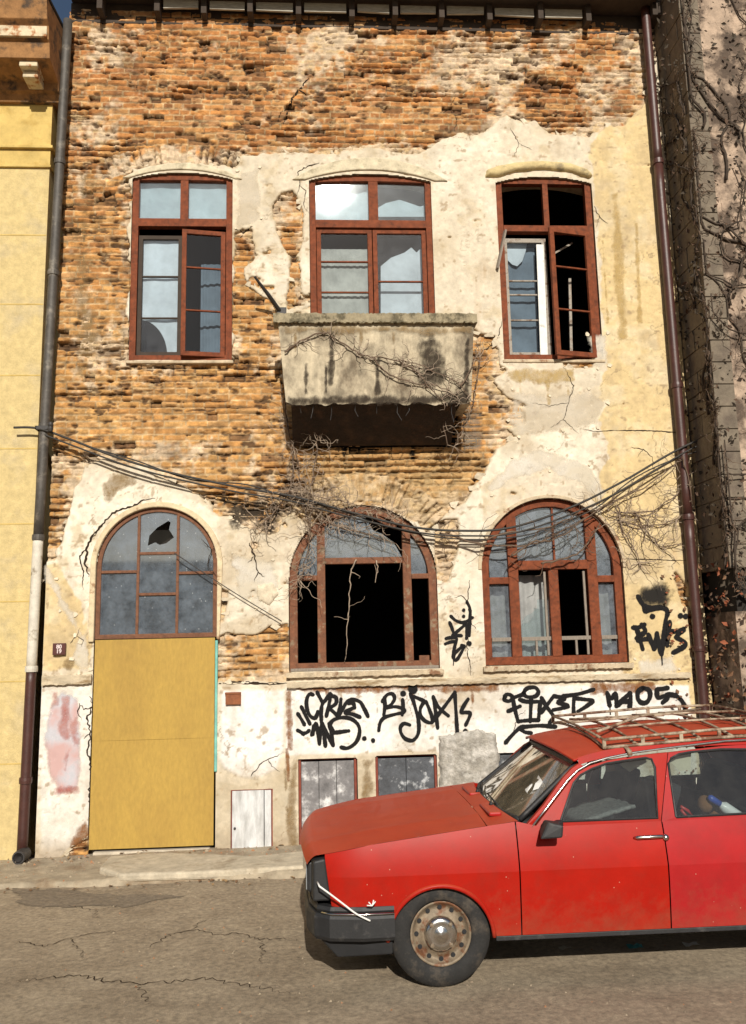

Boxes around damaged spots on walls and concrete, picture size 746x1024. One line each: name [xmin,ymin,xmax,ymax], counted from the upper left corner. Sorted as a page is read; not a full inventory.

crack [278,78,309,124]
spalling [41,9,656,684]
damp [289,327,481,463]
crack [539,369,676,470]
crack [79,498,153,589]
crack [18,904,305,1002]